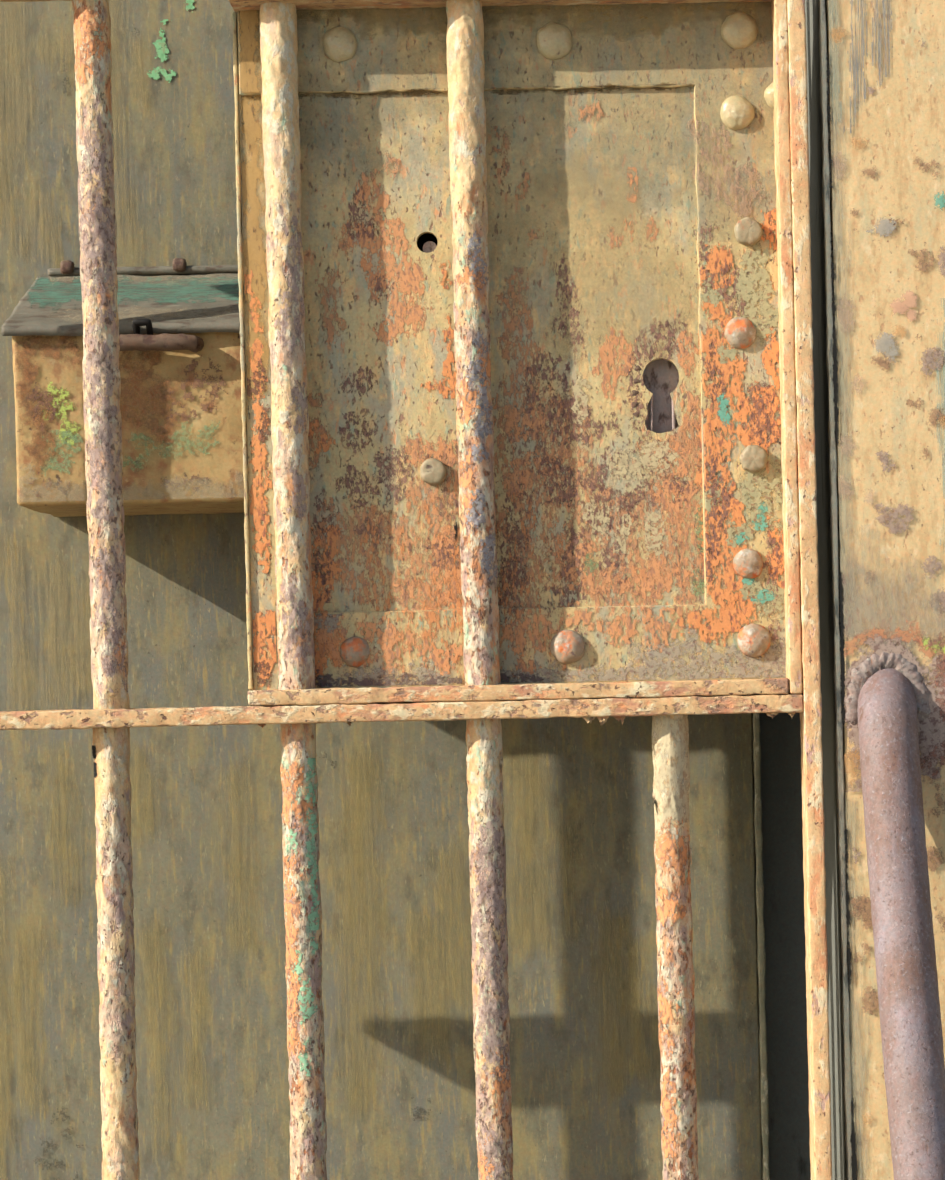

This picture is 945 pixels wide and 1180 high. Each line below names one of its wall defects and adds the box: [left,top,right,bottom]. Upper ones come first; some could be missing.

peeling [147,19,177,83]
rust [543,83,672,121]
rust [78,130,116,296]
rust [239,10,441,574]
rust [761,208,777,258]
rust [15,309,128,693]
rust [167,355,228,421]
rust [253,224,785,687]
rust [843,620,945,817]